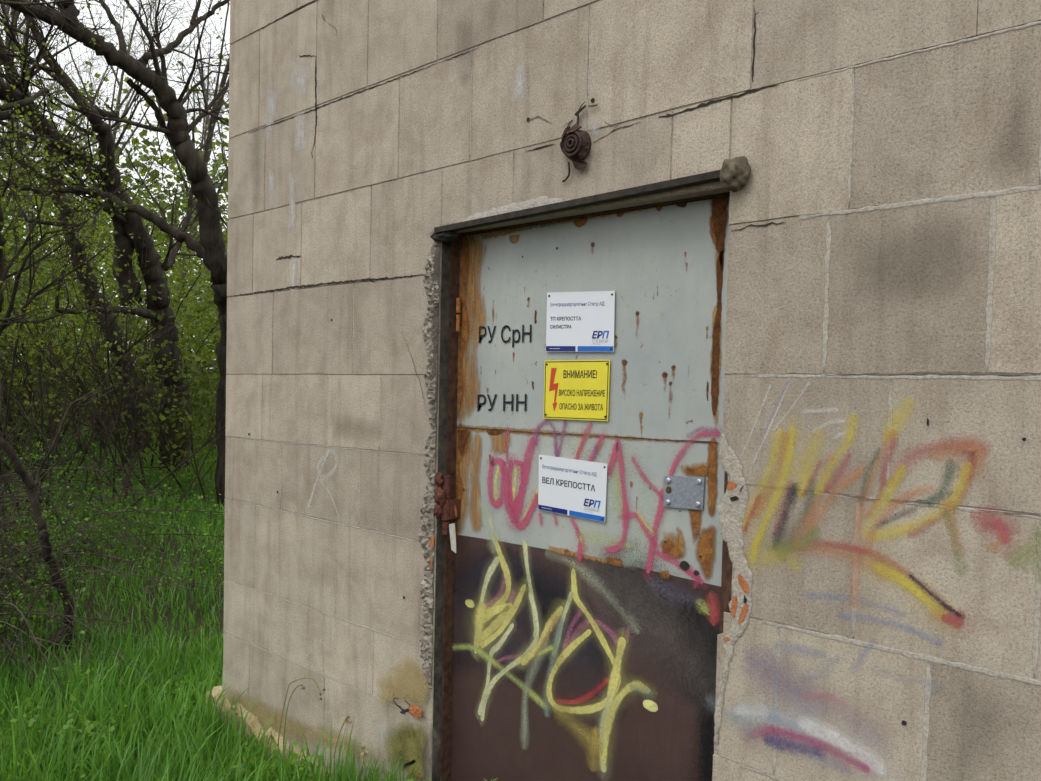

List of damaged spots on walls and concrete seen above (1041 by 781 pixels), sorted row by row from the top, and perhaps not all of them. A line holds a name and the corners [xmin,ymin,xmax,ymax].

crack [526,115,570,152]
crack [593,8,777,143]
spalling [418,241,440,689]
rust [455,206,676,535]
rust [653,438,718,578]
rust [706,196,729,424]
spalling [714,433,753,744]